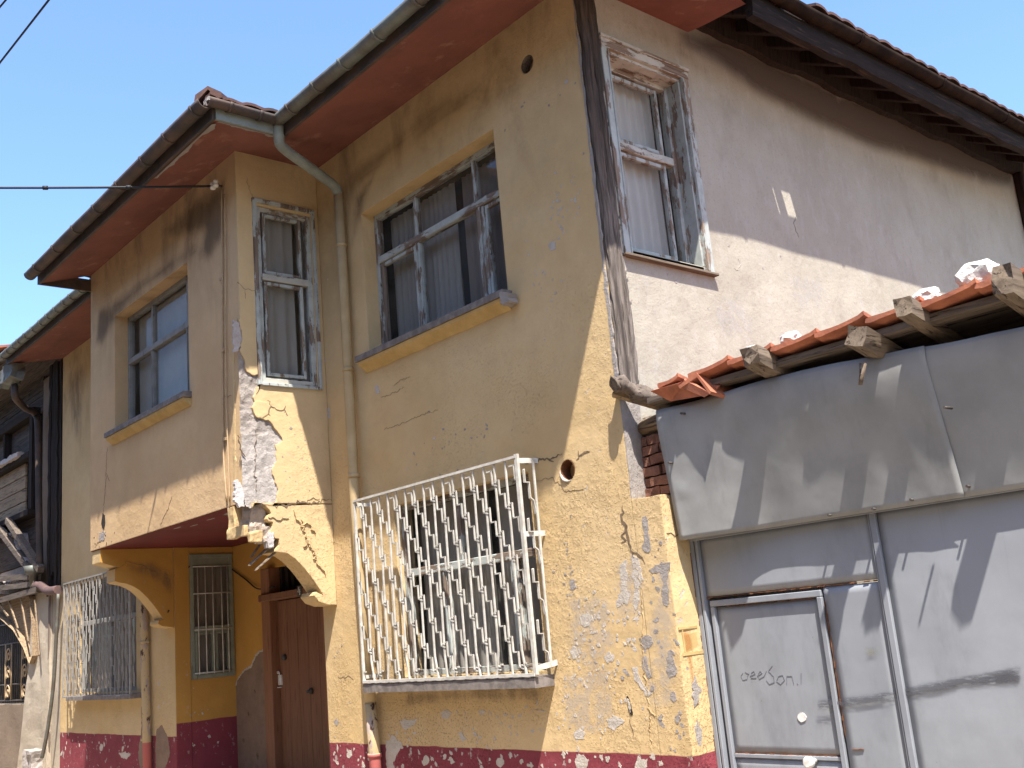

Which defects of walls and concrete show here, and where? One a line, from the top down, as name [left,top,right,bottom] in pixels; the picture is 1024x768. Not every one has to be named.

flaking render [174,320,306,571]
crack [525,451,590,492]
crack [268,497,331,576]
peeling [386,516,706,768]
crack [620,505,655,744]
peeling [119,707,170,768]
peeling [333,719,369,768]